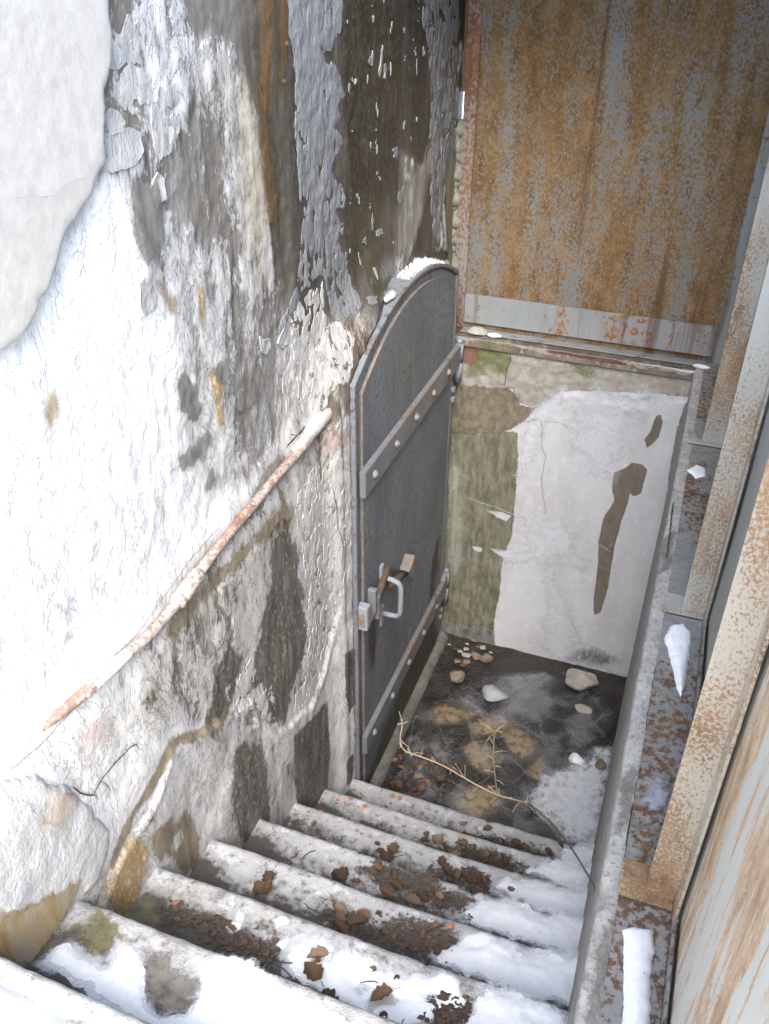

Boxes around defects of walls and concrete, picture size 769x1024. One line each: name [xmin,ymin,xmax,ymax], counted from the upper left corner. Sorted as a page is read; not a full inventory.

peeling [110,14,180,160]
peeling [390,0,460,241]
peeling [279,0,392,419]
leakage [398,153,431,269]
leakage [446,143,457,264]
peeling [440,336,692,664]
leakage [167,503,307,727]
crack [21,744,140,838]
leakage [231,741,270,844]
leakage [293,702,331,808]